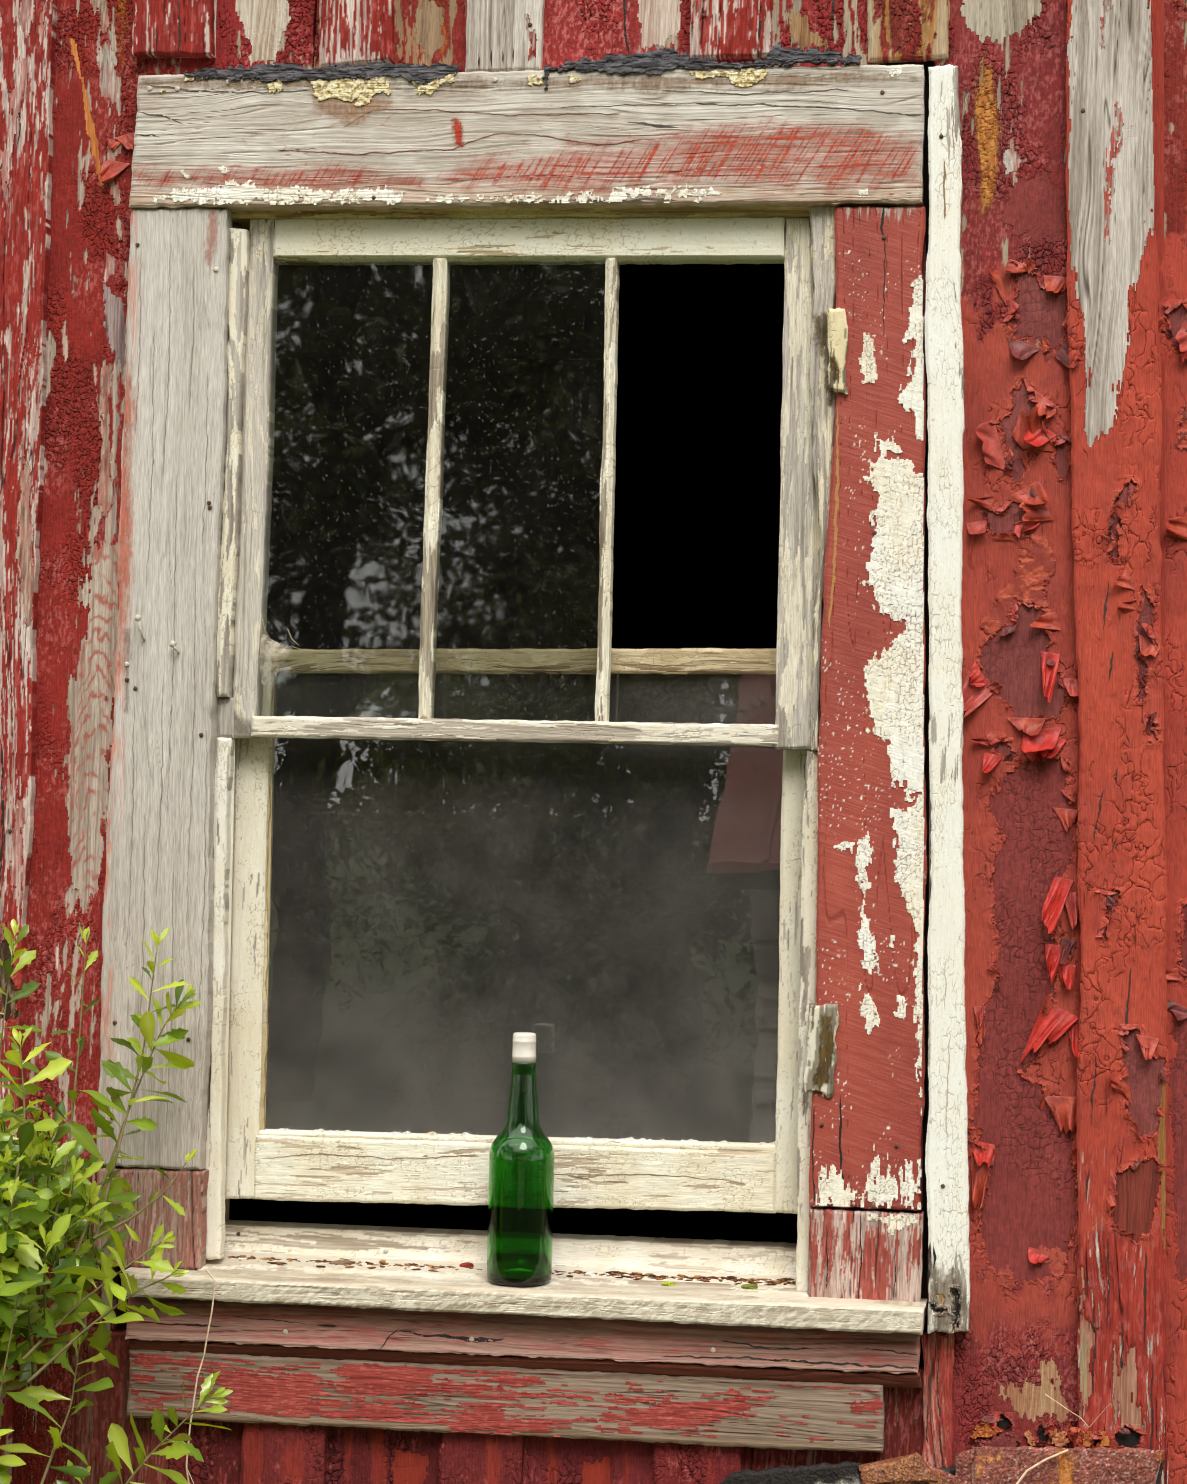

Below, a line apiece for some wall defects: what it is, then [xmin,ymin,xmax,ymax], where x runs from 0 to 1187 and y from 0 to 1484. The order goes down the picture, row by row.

peeling [91,0,125,116]
peeling [235,0,291,66]
peeling [638,0,682,49]
peeling [96,250,127,518]
peeling [426,189,603,204]
peeling [960,0,1155,541]
peeling [62,542,119,916]
peeling [1100,482,1163,743]
peeling [855,833,873,894]
peeling [962,601,1147,1449]
peeling [1106,999,1187,1281]
crack [380,1329,504,1349]